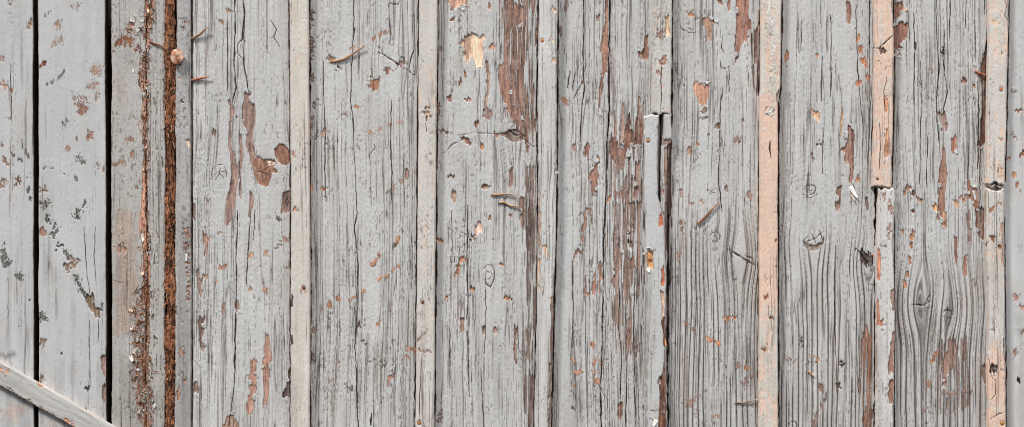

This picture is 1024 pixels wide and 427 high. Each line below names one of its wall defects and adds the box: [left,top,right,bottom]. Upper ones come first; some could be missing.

peeling [717,0,760,97]
peeling [183,92,277,301]
peeling [459,0,569,427]
peeling [572,0,645,358]
peeling [687,80,720,156]
peeling [835,107,869,211]
peeling [85,293,100,318]
peeling [223,334,272,427]
peeling [938,335,997,415]